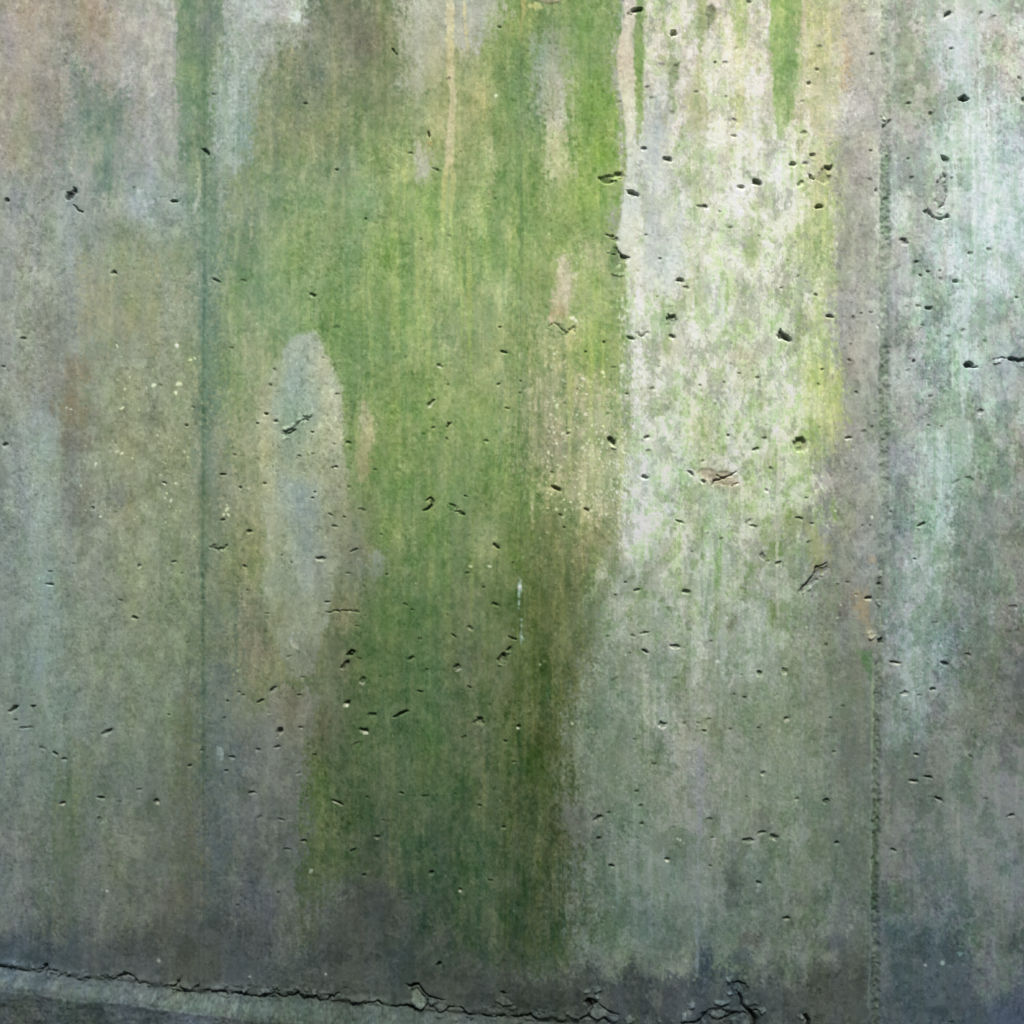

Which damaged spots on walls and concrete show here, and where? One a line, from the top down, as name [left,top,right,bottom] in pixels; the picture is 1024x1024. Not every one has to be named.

leakage [439,0,482,394]
leakage [477,134,504,219]
leakage [327,204,436,420]
leakage [344,538,394,597]
leakage [545,794,601,860]
crack [0,920,554,1023]